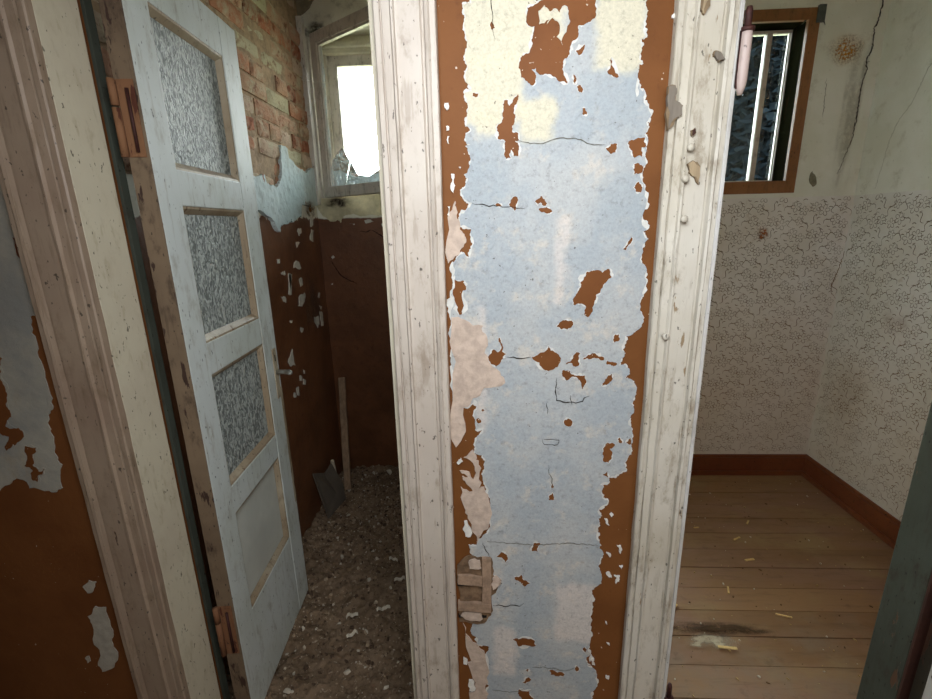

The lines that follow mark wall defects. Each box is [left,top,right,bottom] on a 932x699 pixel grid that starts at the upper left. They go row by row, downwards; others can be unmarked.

flaking render [200,0,383,247]
peeling [664,85,683,131]
peeling [277,259,306,307]
peeling [314,292,324,328]
peeling [0,185,63,492]
peeling [288,349,306,398]
peeling [445,0,653,699]
peeling [83,580,96,593]
peeling [85,606,118,672]